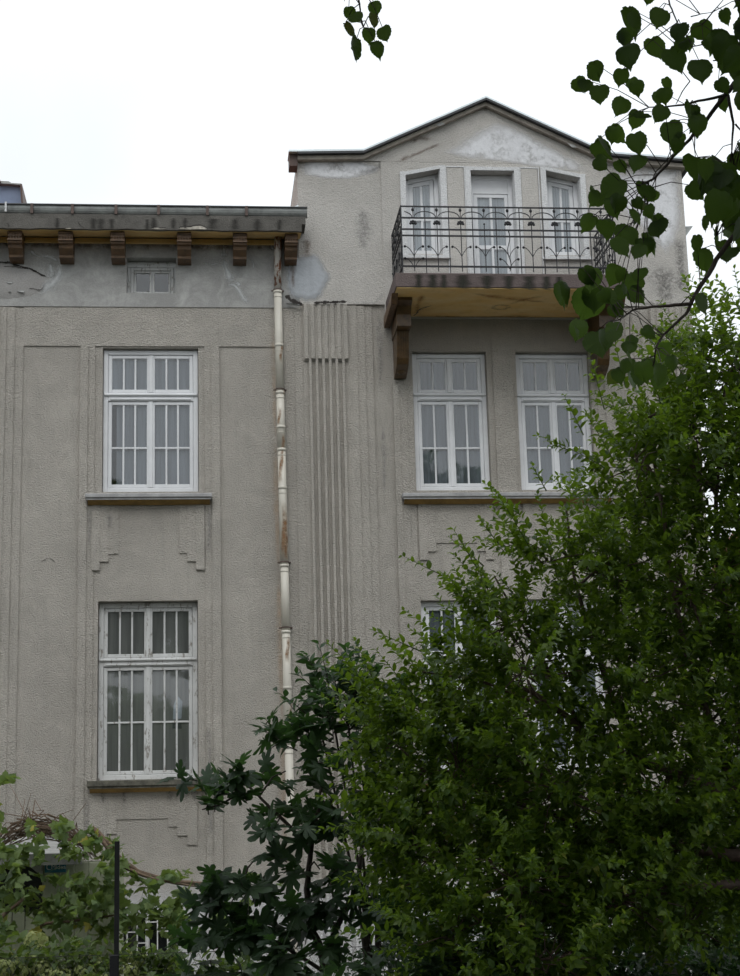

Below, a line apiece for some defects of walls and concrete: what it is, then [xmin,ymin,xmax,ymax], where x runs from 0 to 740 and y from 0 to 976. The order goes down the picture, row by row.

crack [0,261,46,290]